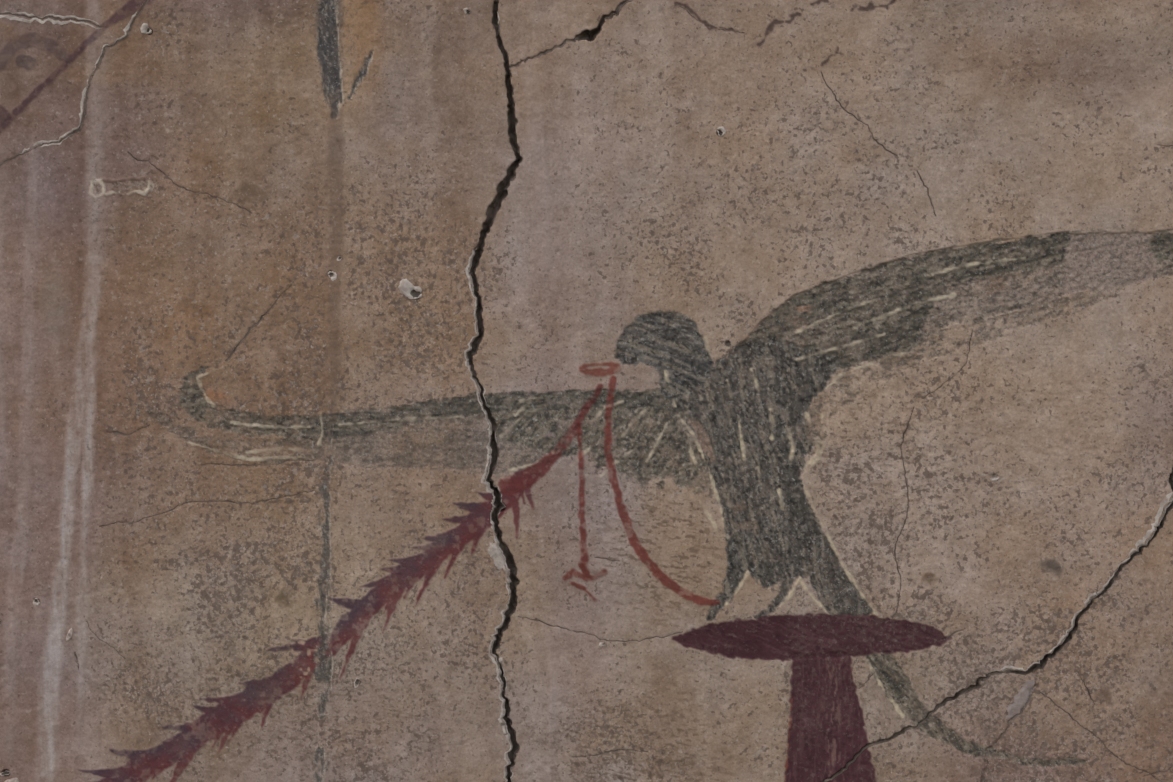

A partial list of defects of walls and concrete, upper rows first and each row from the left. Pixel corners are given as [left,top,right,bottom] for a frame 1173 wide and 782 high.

crack [0,0,149,167]
crack [821,72,936,216]
crack [464,0,683,782]
crack [892,330,973,619]
crack [824,468,1173,782]